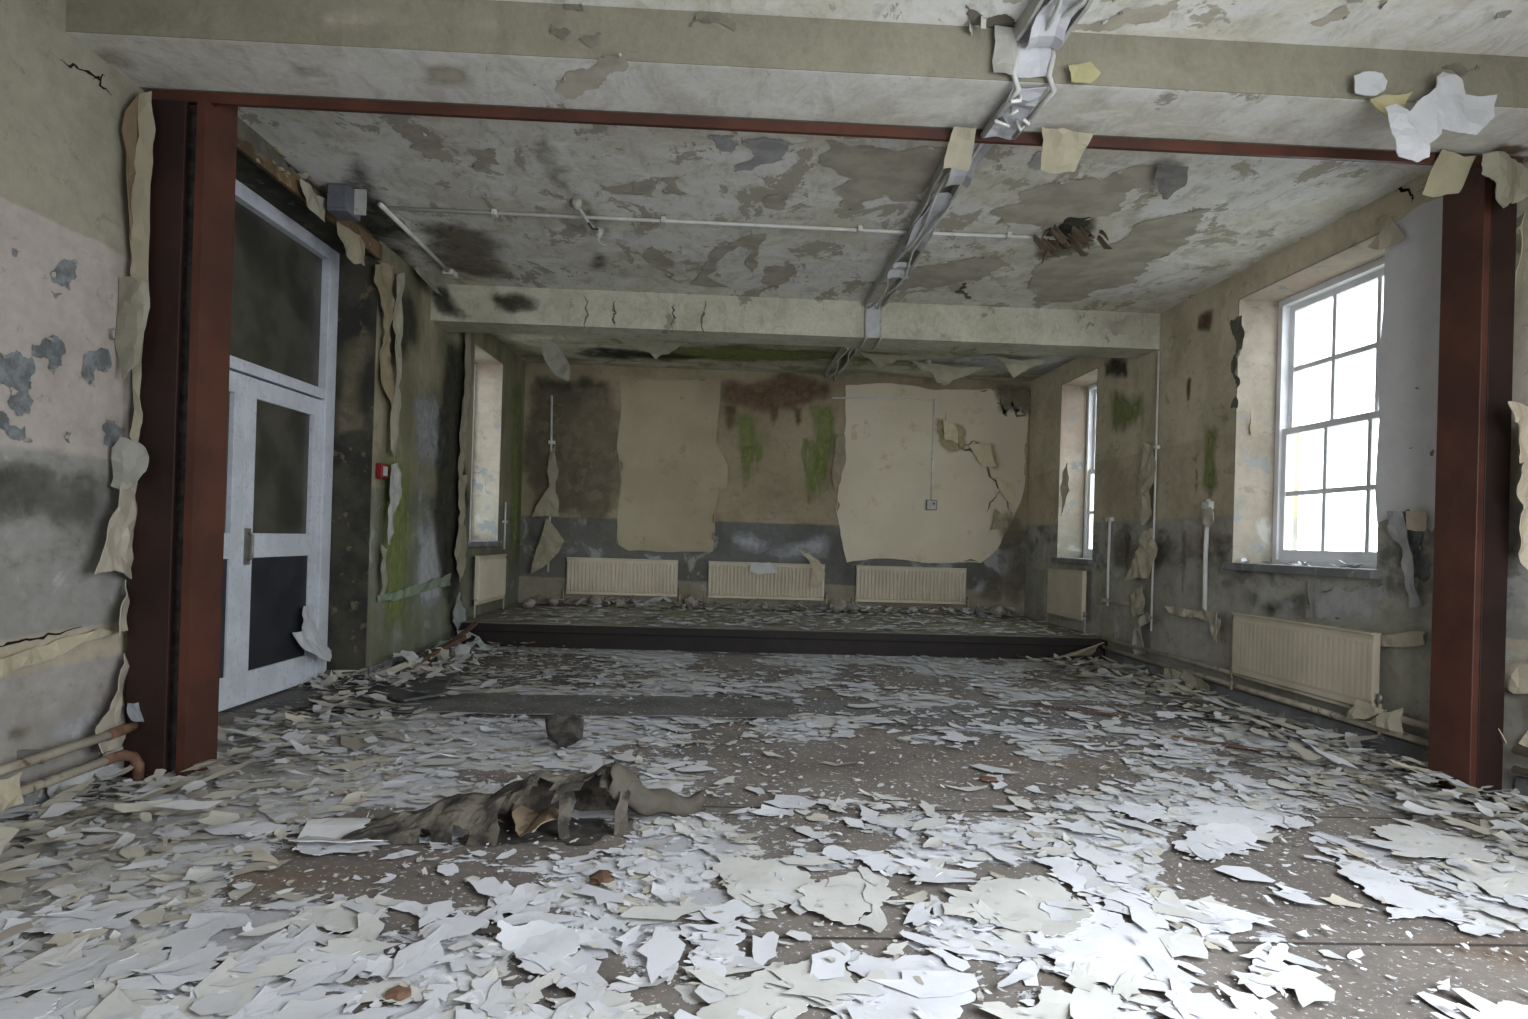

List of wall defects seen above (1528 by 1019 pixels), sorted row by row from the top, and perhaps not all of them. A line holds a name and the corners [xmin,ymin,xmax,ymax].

peeling [966,0,1022,35]
peeling [1072,0,1180,32]
peeling [709,135,794,172]
peeling [819,141,950,211]
peeling [642,234,797,289]
peeling [991,152,1211,303]
water stain [390,297,416,364]
peeling [0,328,116,443]
water stain [338,335,370,431]
water stain [384,345,468,604]
peeling [616,375,728,552]
peeling [836,355,1079,563]